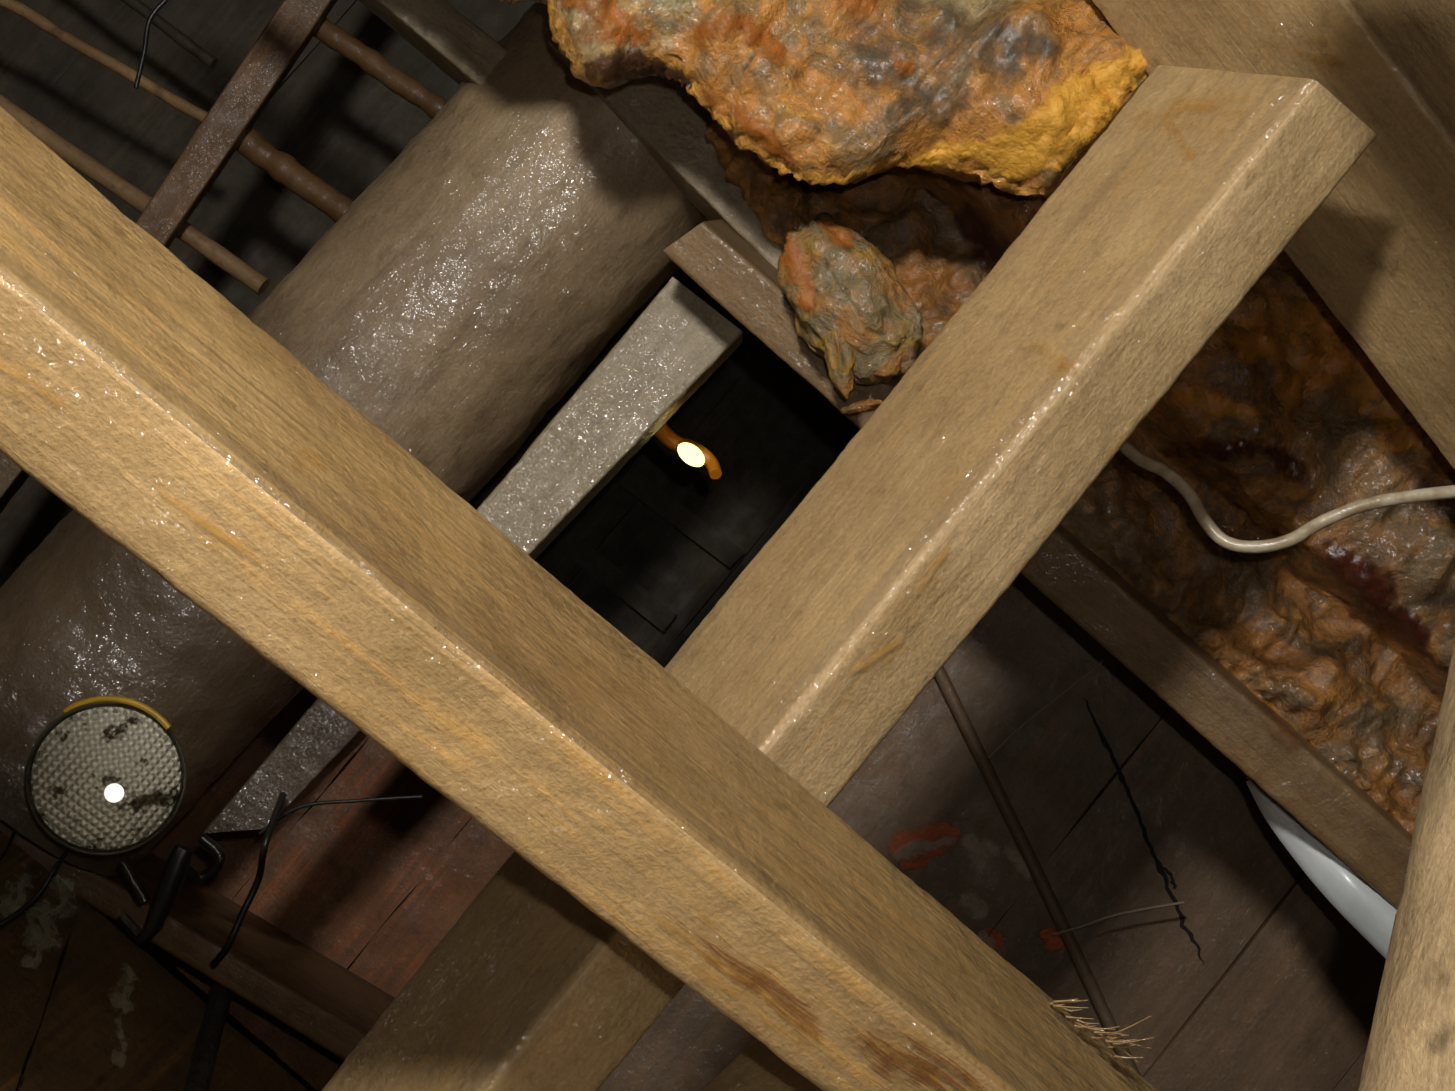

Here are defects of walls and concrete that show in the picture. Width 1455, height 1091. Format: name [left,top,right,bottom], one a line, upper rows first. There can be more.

crack [1083,698,1204,964]
efflorescence [0,865,78,969]
water stain [110,964,137,1069]